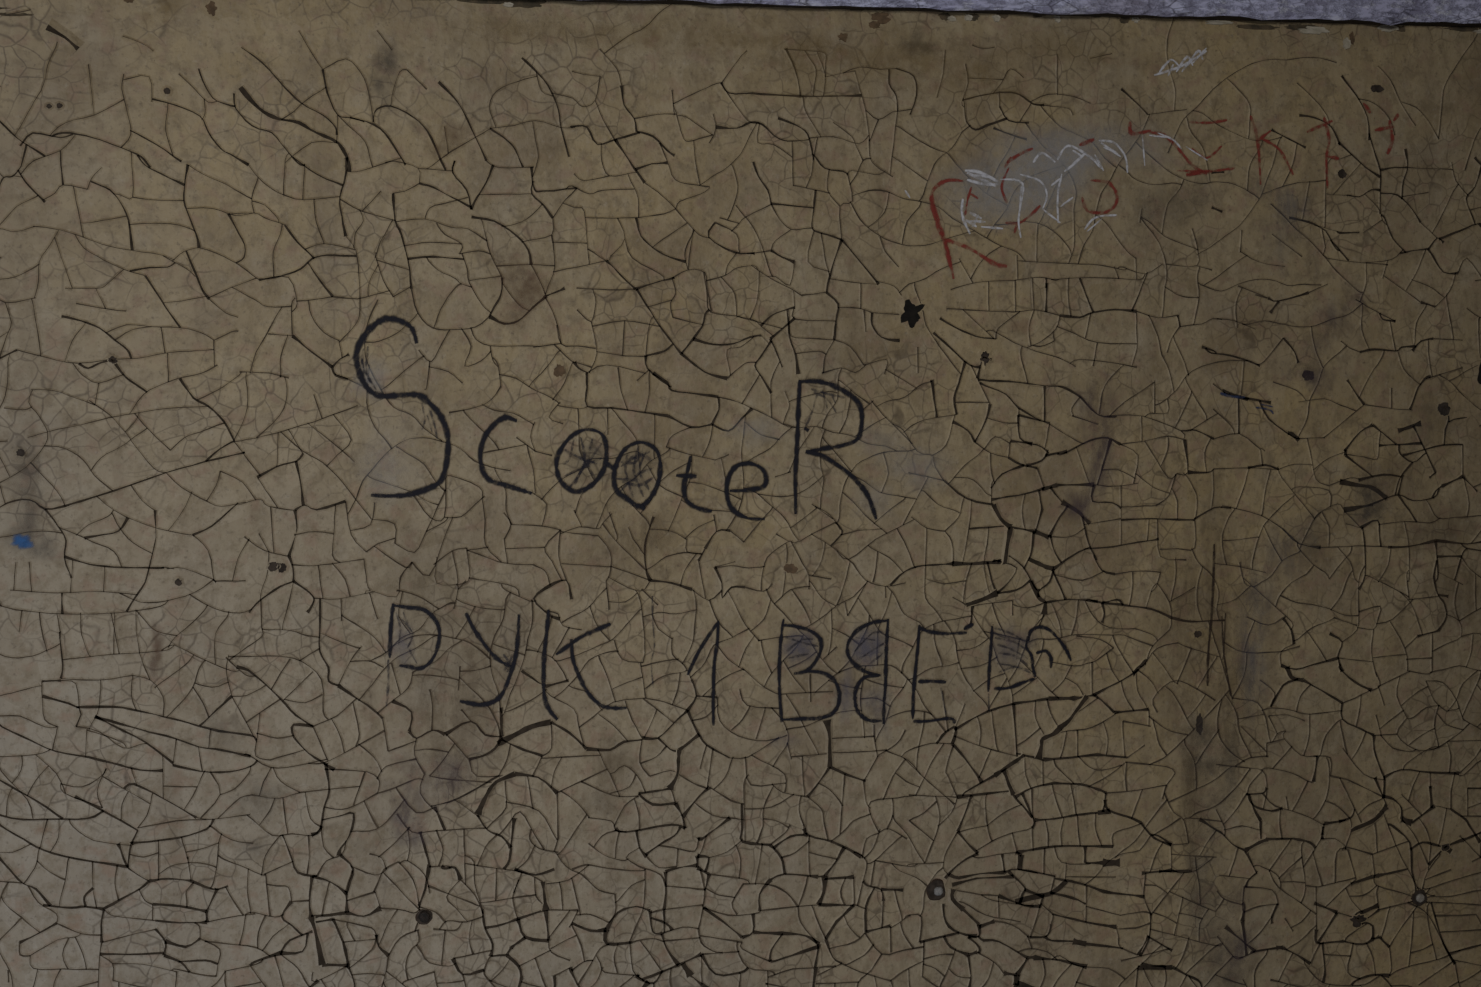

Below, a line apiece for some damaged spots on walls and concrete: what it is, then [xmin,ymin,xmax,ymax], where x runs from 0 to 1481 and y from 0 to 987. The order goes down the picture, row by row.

crack [0,4,1091,987]
crack [548,457,1481,987]
crack [831,369,1286,789]
crack [922,19,1481,933]